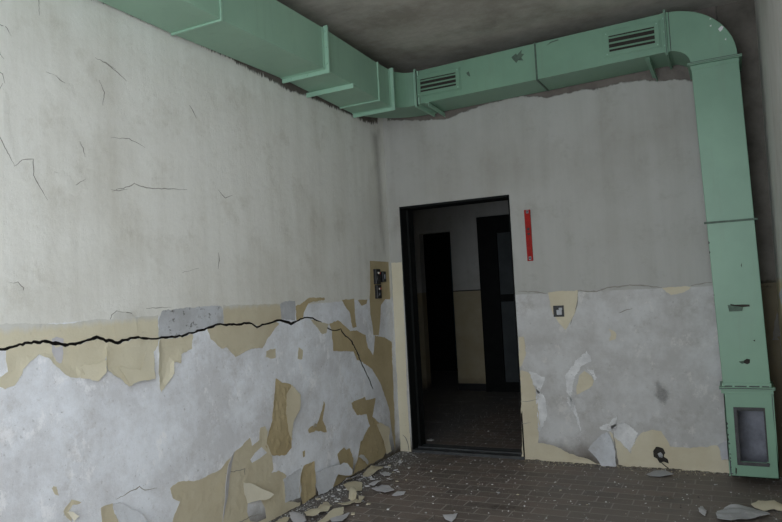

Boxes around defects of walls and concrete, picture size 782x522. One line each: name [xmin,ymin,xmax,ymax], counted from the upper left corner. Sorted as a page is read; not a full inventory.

crack [0,138,47,199]
crack [111,183,187,191]
peeling [518,282,712,330]
peeling [0,304,281,392]
crack [0,317,373,388]
peeling [170,261,411,522]
peeling [519,337,732,477]
peeling [101,503,147,522]